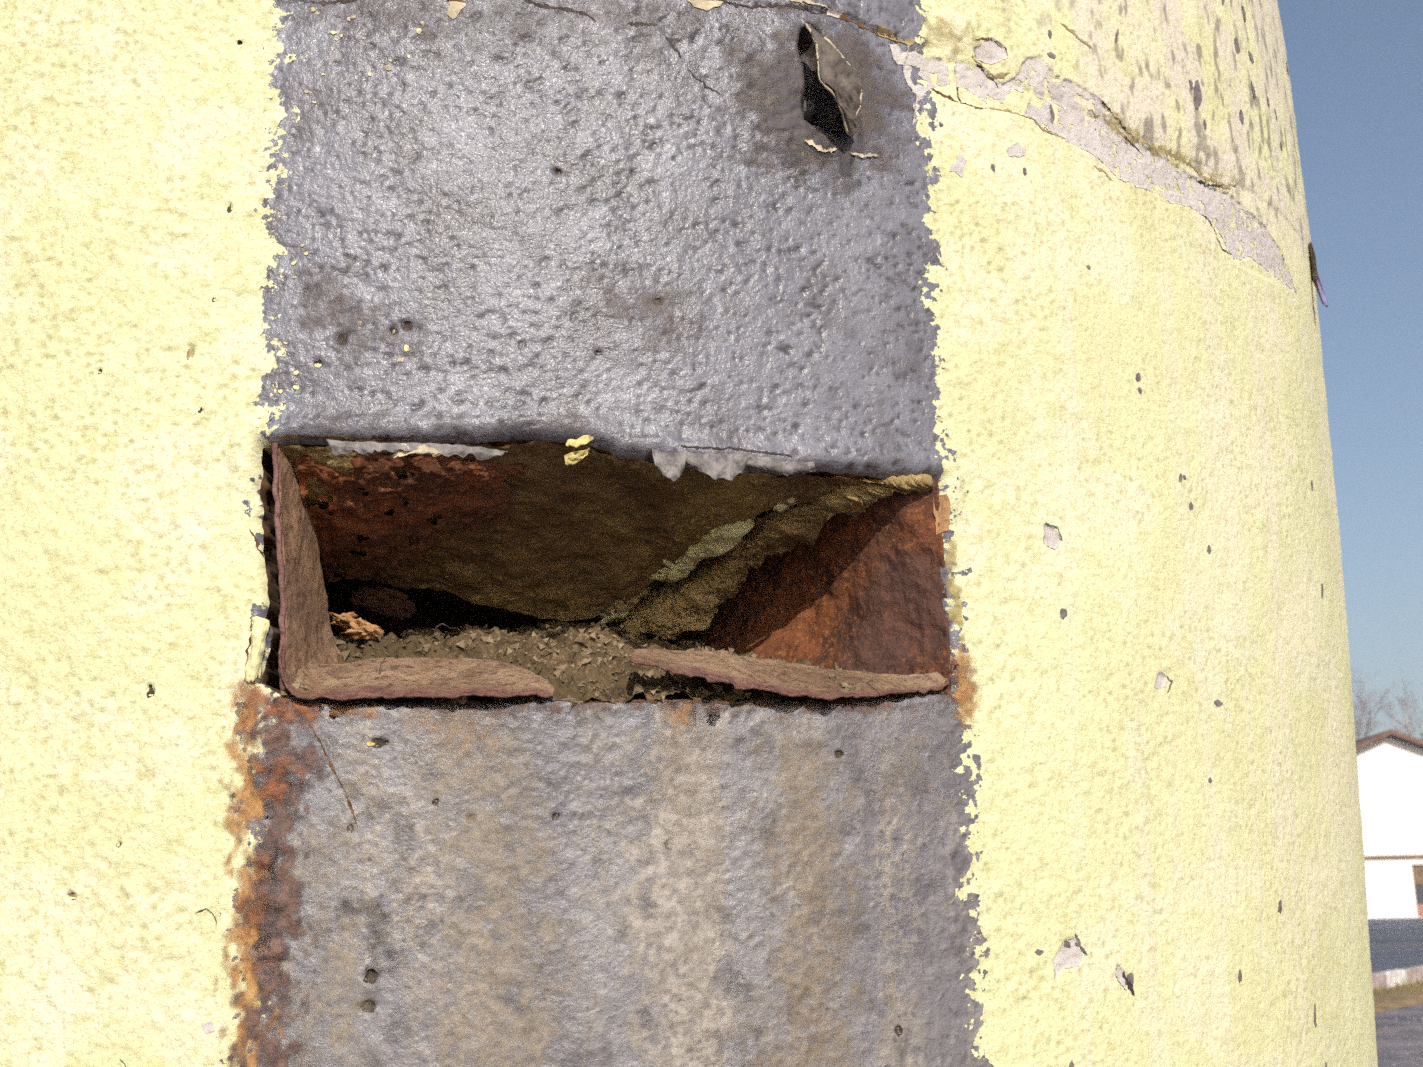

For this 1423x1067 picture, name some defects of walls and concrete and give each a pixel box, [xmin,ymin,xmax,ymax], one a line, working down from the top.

crack [1061,23,1092,48]
crack [931,55,1065,139]
peeling [877,24,1297,293]
crack [1087,108,1238,254]
peeling [1308,242,1328,307]
peeling [326,439,508,461]
peeling [564,435,594,465]
peeling [651,447,816,482]
corrosion [329,586,417,641]
peeling [245,616,270,683]
corrosion [802,700,892,713]
corrosion [225,685,372,1067]